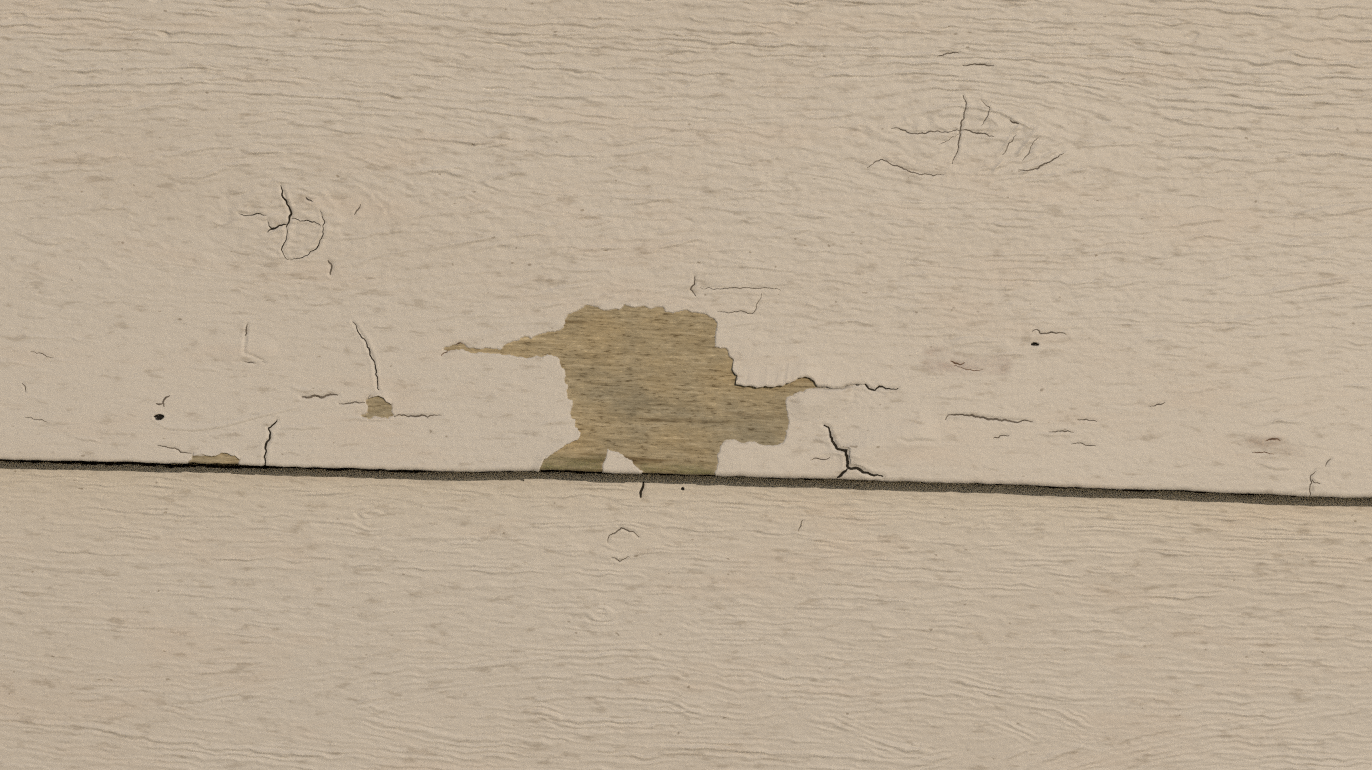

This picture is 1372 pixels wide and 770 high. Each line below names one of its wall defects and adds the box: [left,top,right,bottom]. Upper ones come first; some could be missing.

crack [241,185,361,275]
peeling [361,389,393,419]
peeling [444,305,866,475]
crack [812,425,883,478]